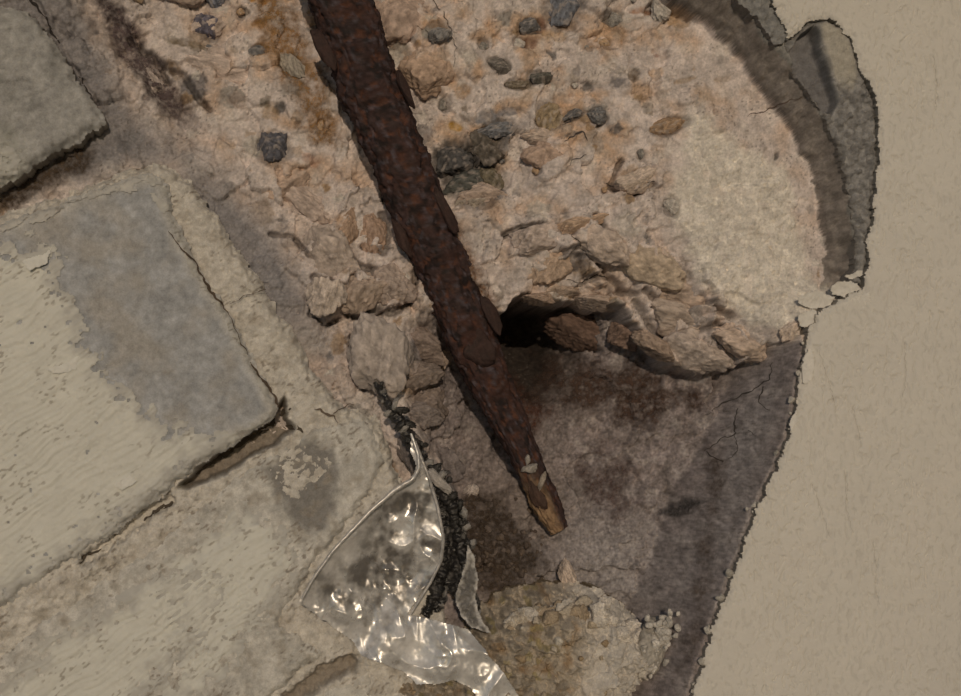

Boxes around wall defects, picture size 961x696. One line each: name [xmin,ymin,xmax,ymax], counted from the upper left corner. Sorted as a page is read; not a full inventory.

crack [80,549,101,564]
peeling [0,229,288,602]
crack [144,501,173,521]
spalling [0,0,453,483]
crack [168,231,303,476]
rust [259,0,568,535]
spalling [374,0,855,696]
crack [704,362,773,463]
flaking render [784,21,878,285]
peeling [830,281,861,297]